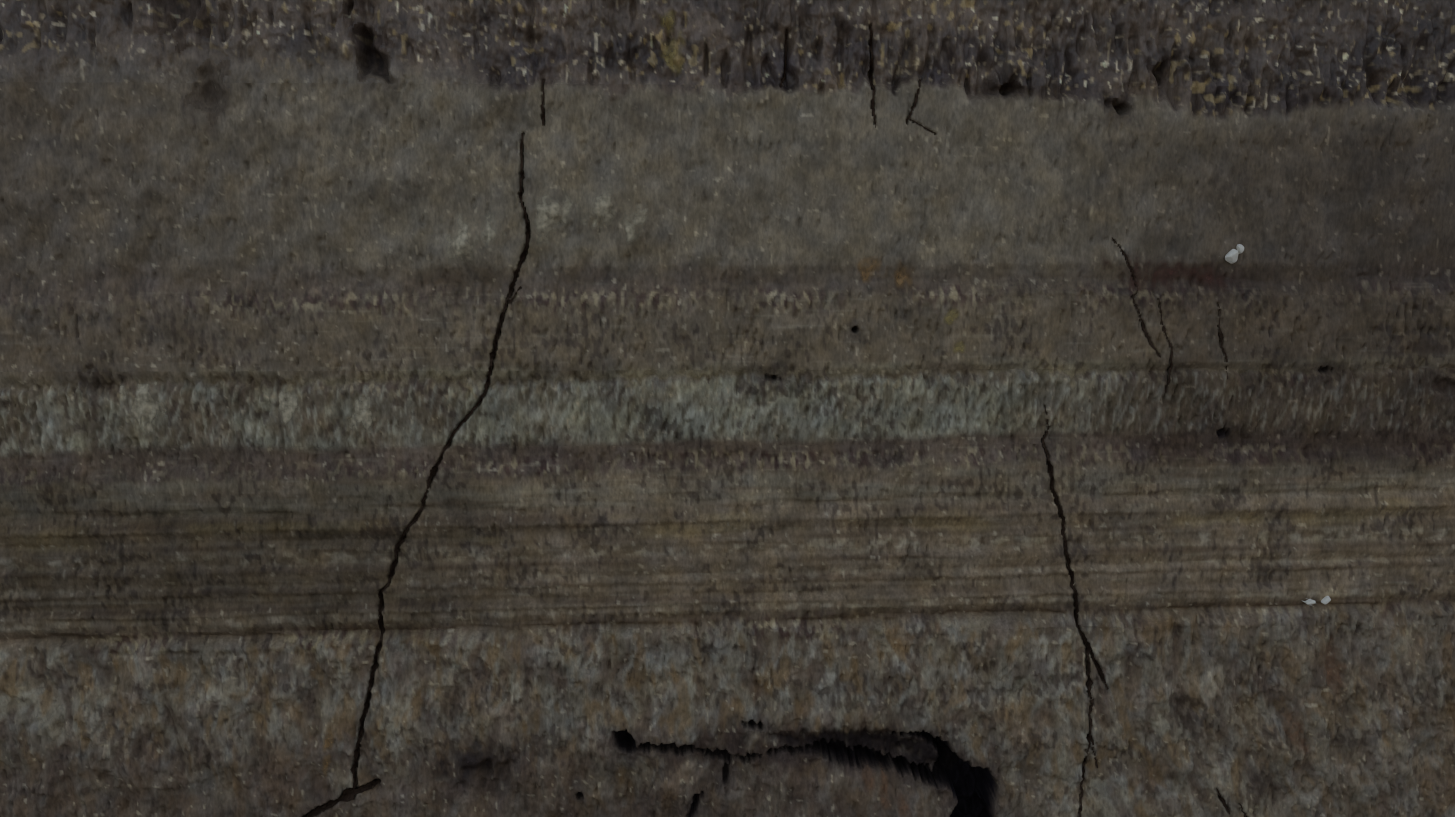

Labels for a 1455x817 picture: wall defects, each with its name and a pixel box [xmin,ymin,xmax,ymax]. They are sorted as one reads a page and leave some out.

crack [306,79,545,817]
crack [1042,405,1109,817]
crack [1112,237,1173,395]
crack [1218,304,1228,379]